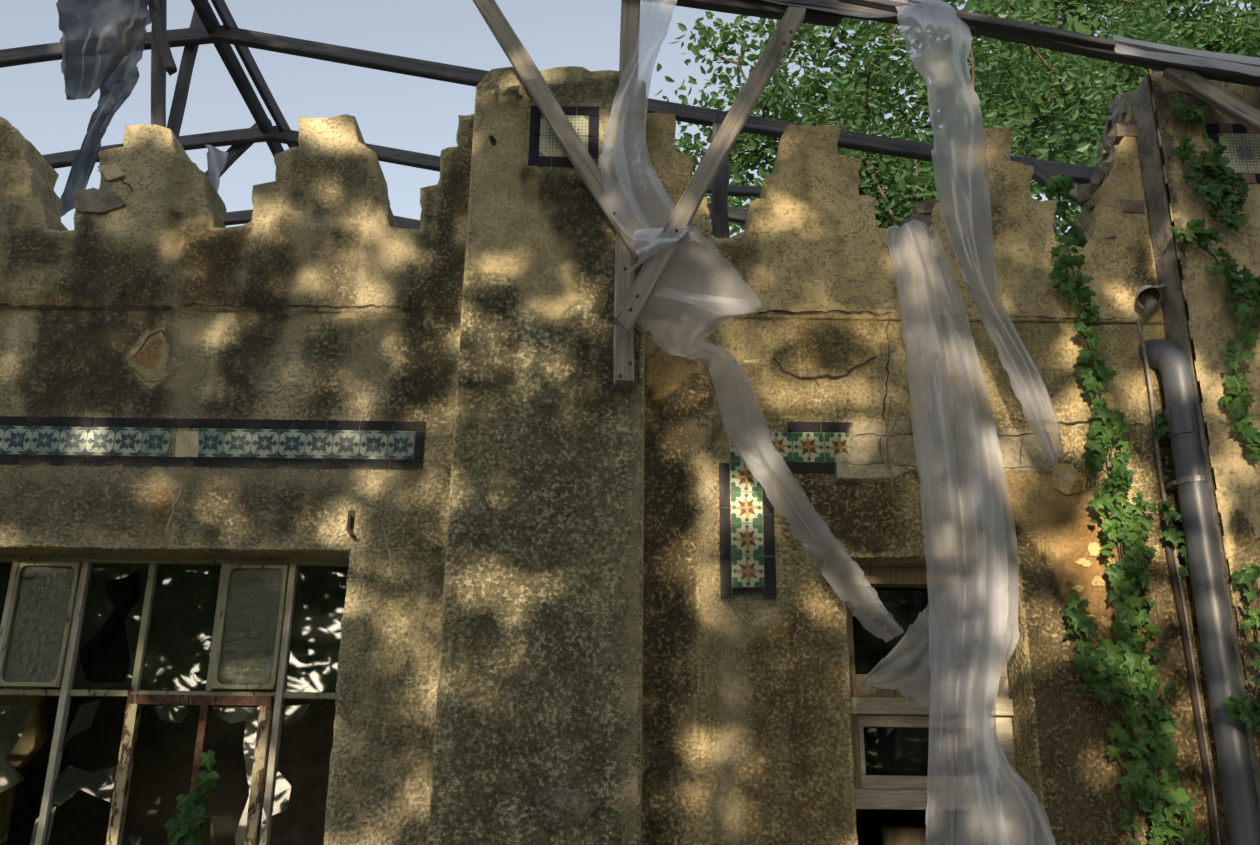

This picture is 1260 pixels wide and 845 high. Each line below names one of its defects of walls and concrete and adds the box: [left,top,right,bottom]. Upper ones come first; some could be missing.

damp [0,215,60,340]
spalling [125,326,170,389]
crack [0,303,452,382]
damp [28,156,516,417]
damp [540,178,615,403]
crack [754,310,915,467]
peeling [837,420,918,478]
crack [997,418,1094,469]
crack [1013,314,1131,322]
peeling [997,431,1159,656]
damp [617,373,780,845]